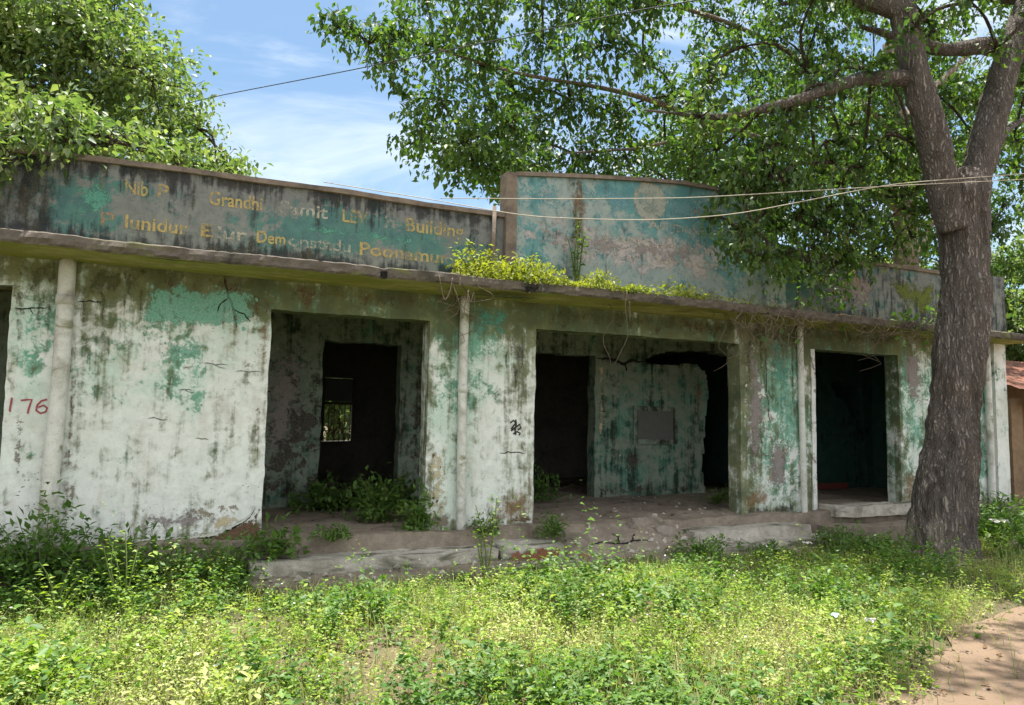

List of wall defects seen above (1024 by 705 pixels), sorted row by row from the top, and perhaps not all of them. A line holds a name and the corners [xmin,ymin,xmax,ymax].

leakage [16,265,55,338]
crack [145,257,250,329]
peeling [141,283,258,363]
crack [597,357,645,371]
flaking render [765,438,794,491]
spalling [97,506,260,545]